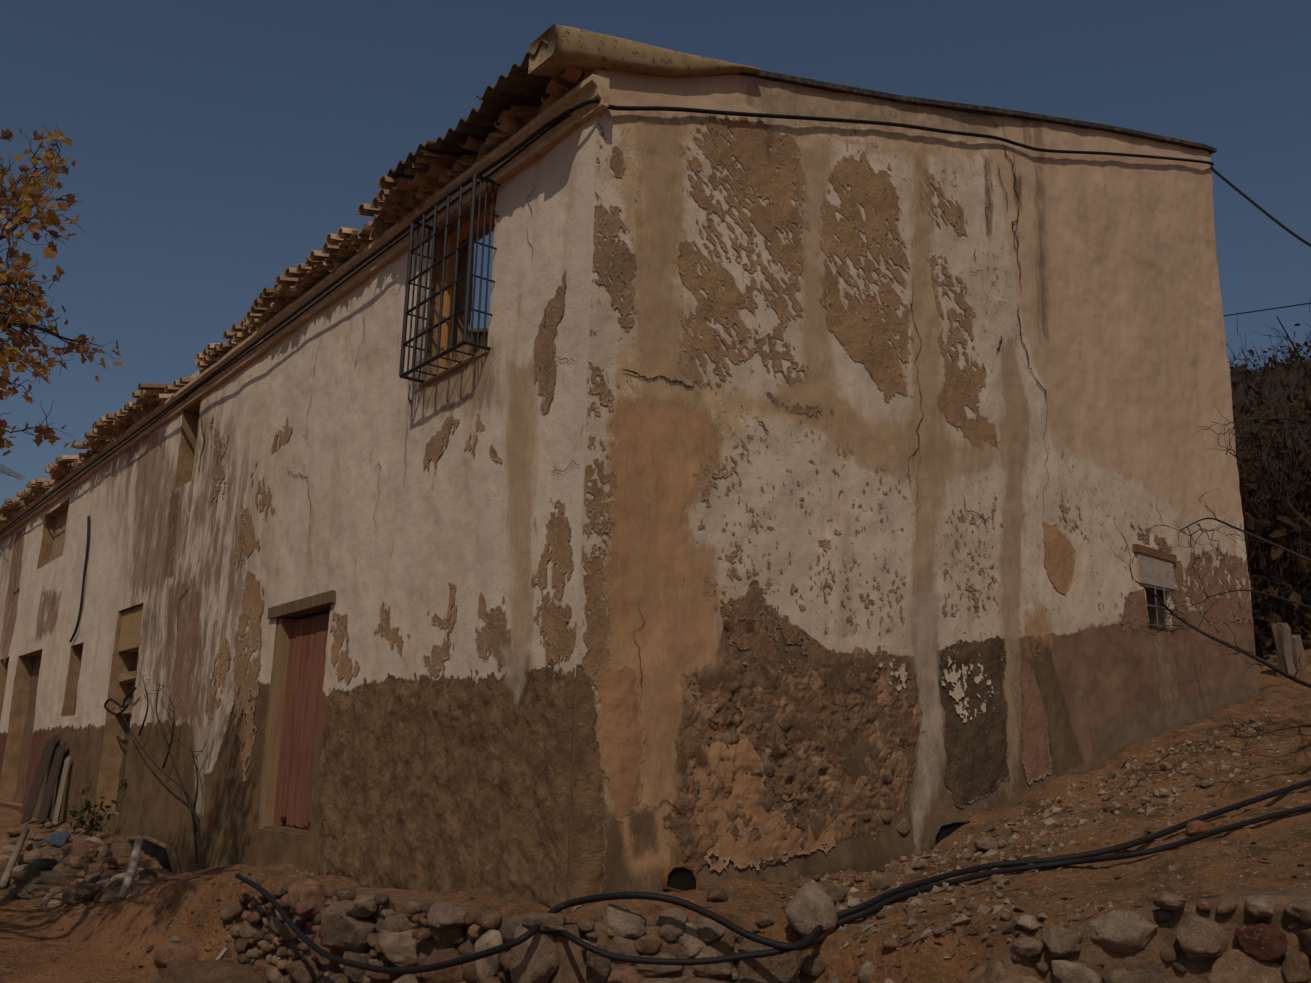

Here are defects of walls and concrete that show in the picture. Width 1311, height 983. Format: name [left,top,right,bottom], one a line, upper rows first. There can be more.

spalling [317,361,619,915]
peeling [532,270,567,413]
crack [622,369,699,389]
spalling [662,732,836,892]
peeling [670,110,915,416]
spalling [683,434,909,674]
crack [908,278,924,519]
leakage [759,145,1082,877]
peeling [926,254,1000,449]
spalling [931,635,1051,850]
crack [969,115,1049,503]
peeling [1131,522,1253,631]